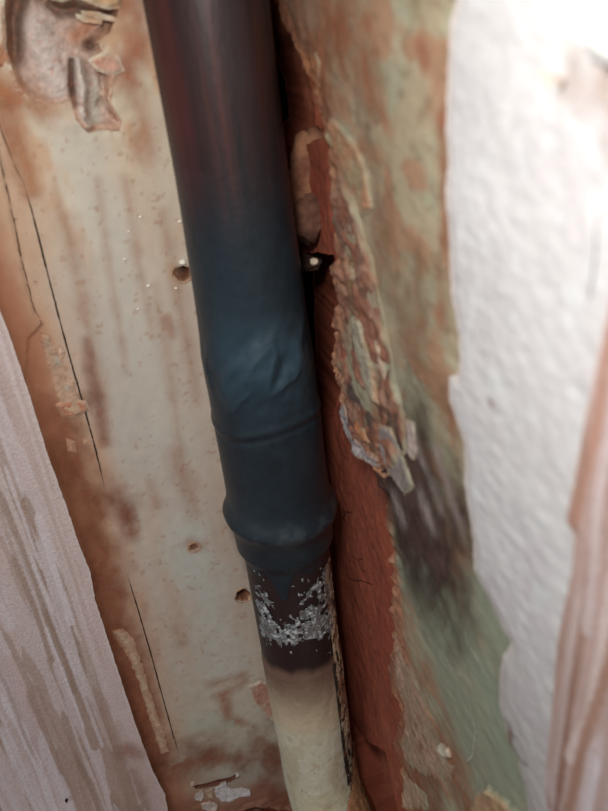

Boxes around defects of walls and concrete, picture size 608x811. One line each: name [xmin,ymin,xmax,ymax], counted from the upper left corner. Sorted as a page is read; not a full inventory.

spalling [0,0,125,133]
crack [0,126,104,484]
spalling [301,271,317,365]
spalling [325,116,419,496]
corrosion [53,411,126,631]
damp [418,494,434,532]
peeling [110,628,169,754]
corrosion [122,659,168,765]
crack [127,575,178,749]
peeling [470,784,519,811]